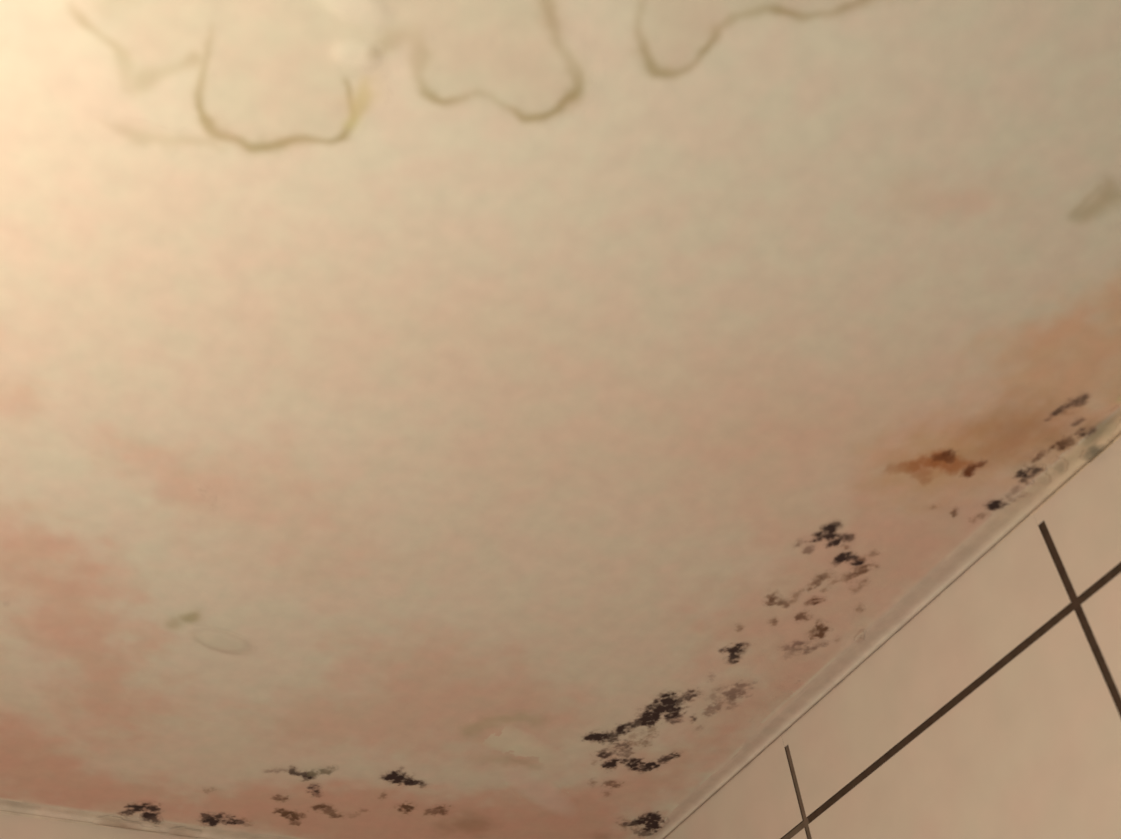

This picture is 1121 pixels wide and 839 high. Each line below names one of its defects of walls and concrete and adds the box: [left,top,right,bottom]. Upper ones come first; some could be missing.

damp [45,0,916,169]
corrosion [842,380,1103,519]
damp [0,256,1121,839]